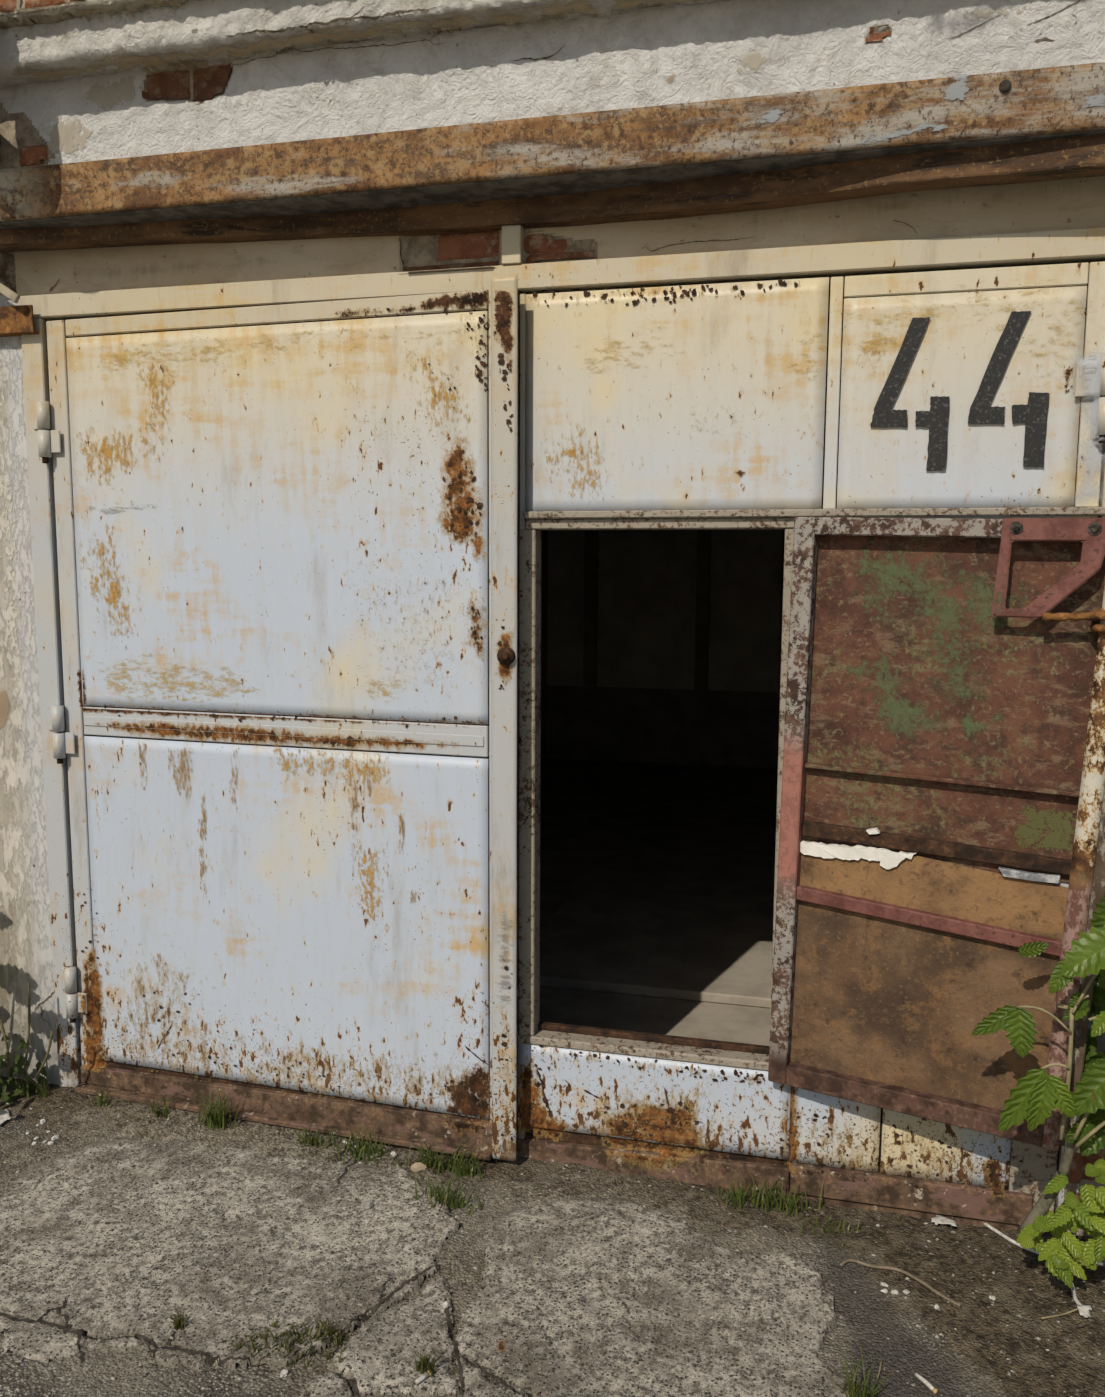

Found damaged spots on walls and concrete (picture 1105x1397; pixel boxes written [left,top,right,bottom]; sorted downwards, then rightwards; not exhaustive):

spalling [0,0,123,29]
crack [225,5,462,70]
spalling [86,59,233,109]
spalling [400,230,500,274]
spalling [523,229,597,264]
corrosion [407,351,484,557]
corrosion [468,603,512,689]
corrosion [77,654,484,922]
corrosion [80,893,568,1141]
crack [0,1296,278,1367]
crack [333,1264,442,1397]
crack [444,1300,531,1397]